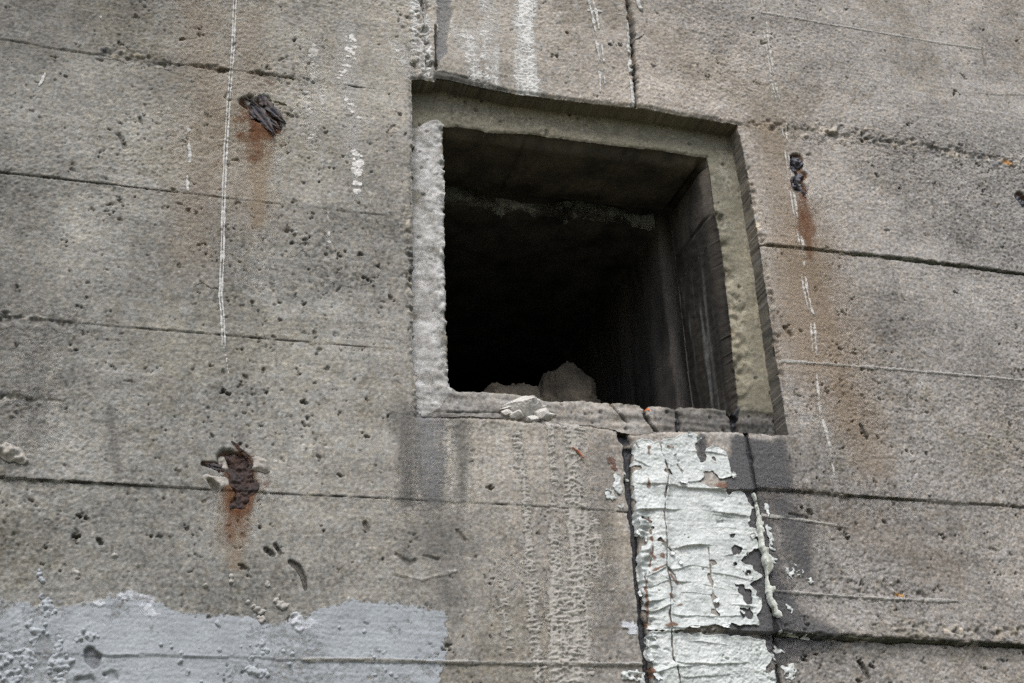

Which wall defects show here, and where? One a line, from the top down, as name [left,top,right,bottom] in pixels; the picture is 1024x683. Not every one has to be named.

corrosion [799,193,815,240]
peeling [605,430,810,683]